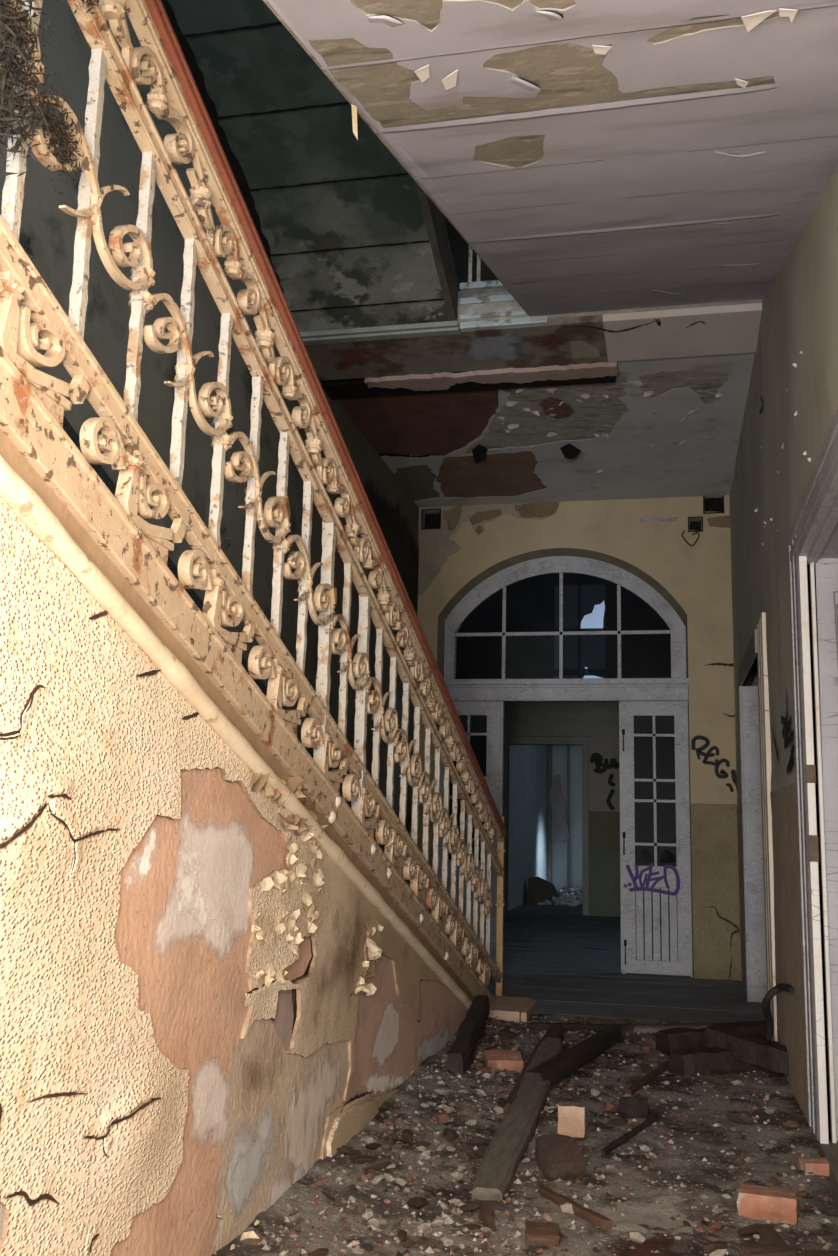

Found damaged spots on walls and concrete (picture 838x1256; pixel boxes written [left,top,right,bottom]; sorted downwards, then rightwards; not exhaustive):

peeling [351,0,443,31]
peeling [485,0,576,9]
peeling [648,8,798,43]
peeling [310,38,775,140]
peeling [474,135,545,167]
peeling [365,362,730,596]
crack [0,685,46,753]
crack [0,775,120,883]
crack [703,906,740,980]
flaking render [110,768,468,1256]
crack [0,1081,161,1157]
crack [3,1176,63,1206]